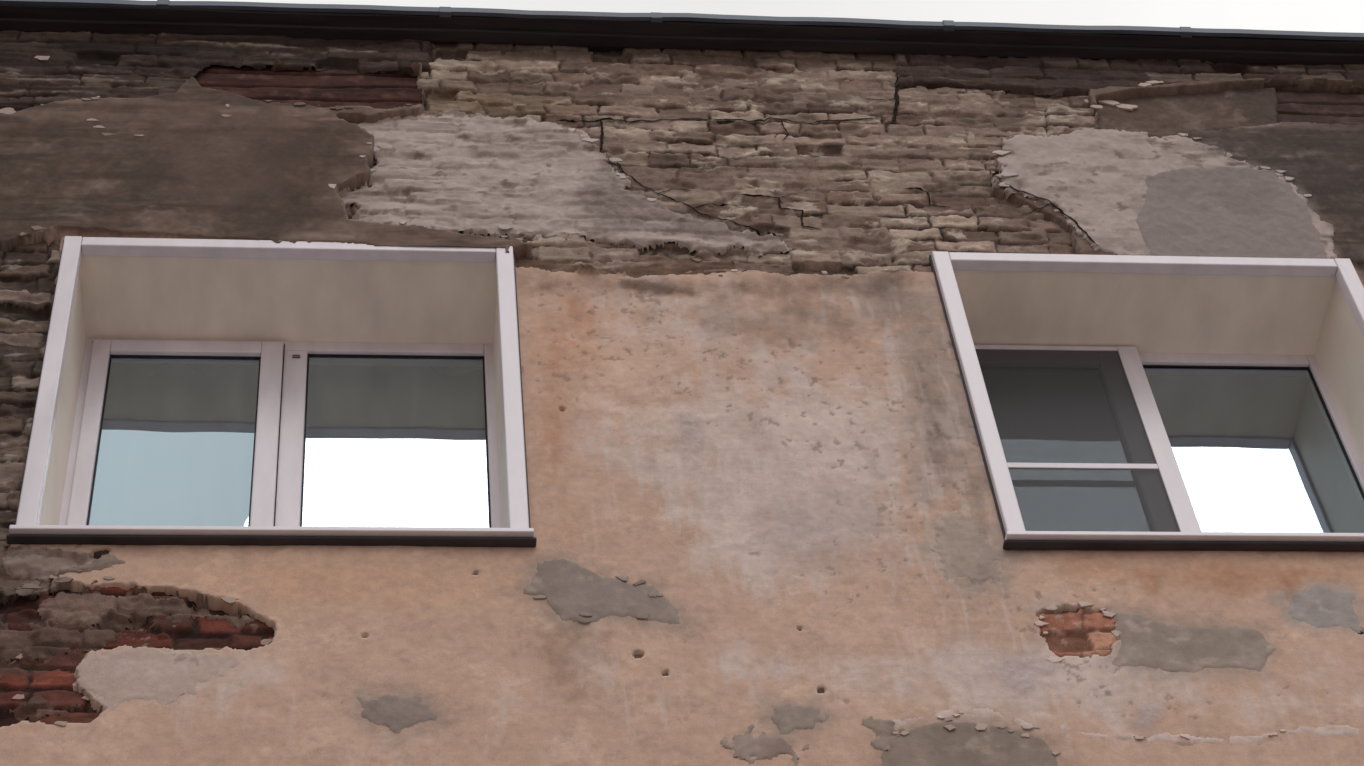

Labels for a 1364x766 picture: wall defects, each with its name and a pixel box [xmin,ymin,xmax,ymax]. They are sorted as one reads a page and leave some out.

crack [555,77,899,237]
flaking render [195,42,1364,279]
spalling [0,225,274,727]
spalling [1034,601,1120,663]